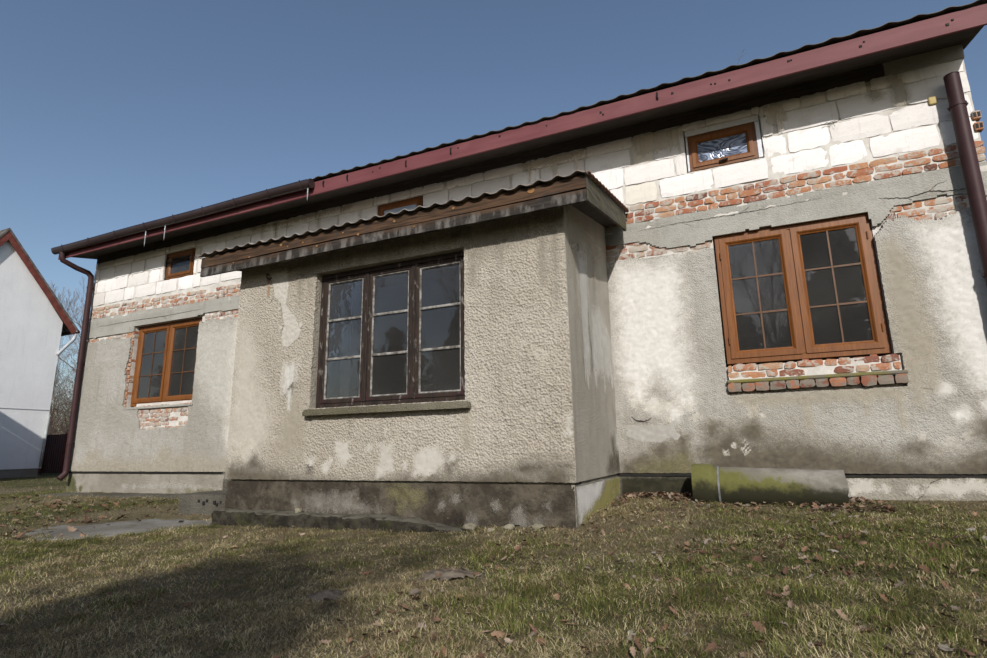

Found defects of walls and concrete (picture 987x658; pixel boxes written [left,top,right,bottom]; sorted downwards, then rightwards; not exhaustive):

crack [882,180,961,200]
spalling [267,267,303,347]
spalling [88,331,192,430]
leakage [374,457,575,483]
leakage [608,389,987,496]